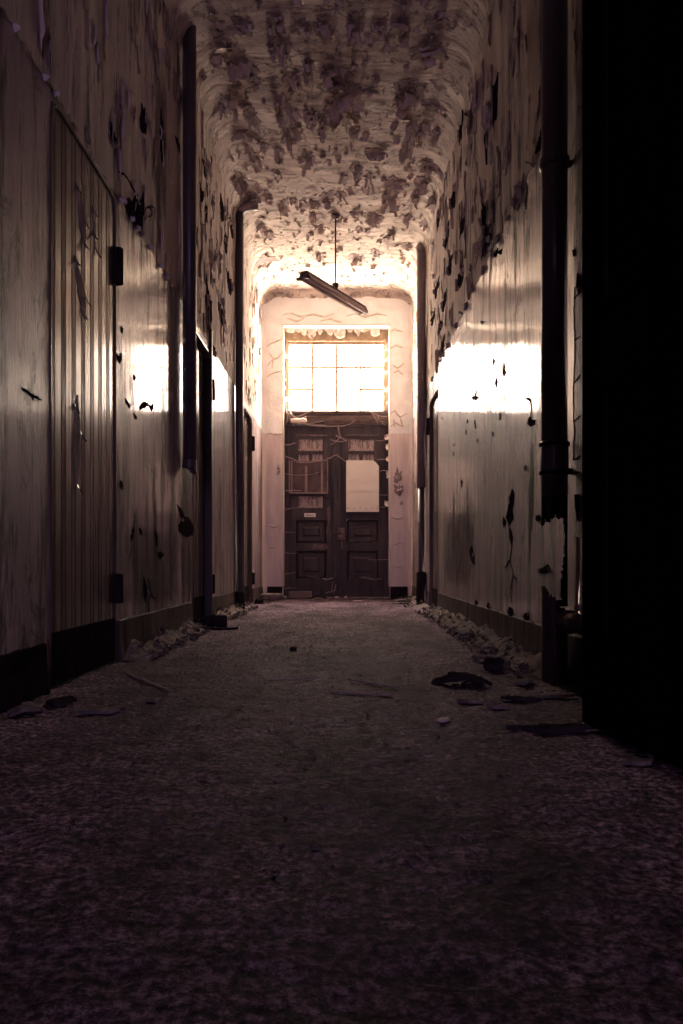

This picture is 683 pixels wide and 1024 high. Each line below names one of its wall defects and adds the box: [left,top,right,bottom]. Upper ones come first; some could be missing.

peeling [38,0,61,97]
peeling [108,0,183,297]
peeling [196,0,541,428]
flaking render [177,504,195,537]
flaking render [502,489,514,545]